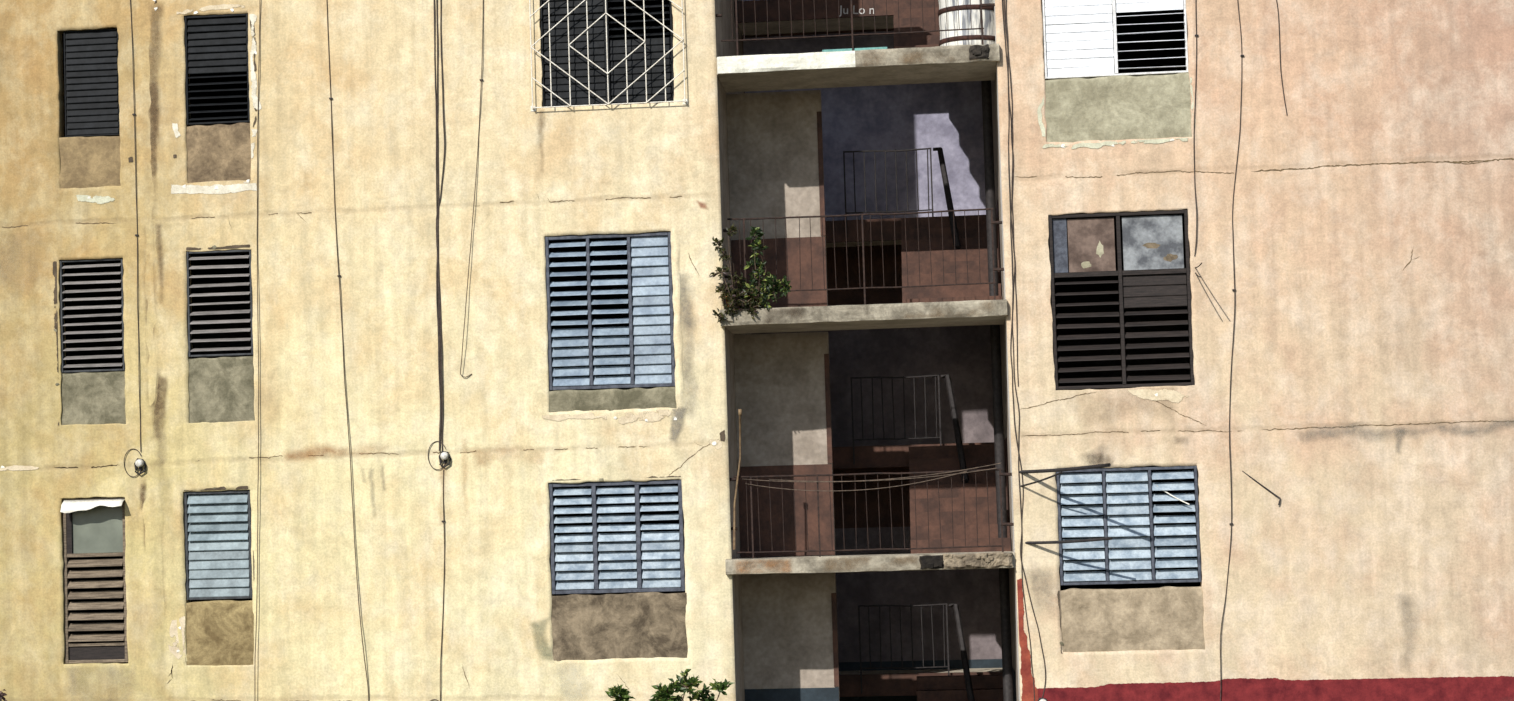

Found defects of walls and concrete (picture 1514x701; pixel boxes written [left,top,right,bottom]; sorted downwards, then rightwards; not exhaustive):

peeling [176,4,261,158]
crack [1014,158,1514,178]
peeling [171,179,257,194]
crack [1022,392,1513,436]
spalling [919,552,1013,570]